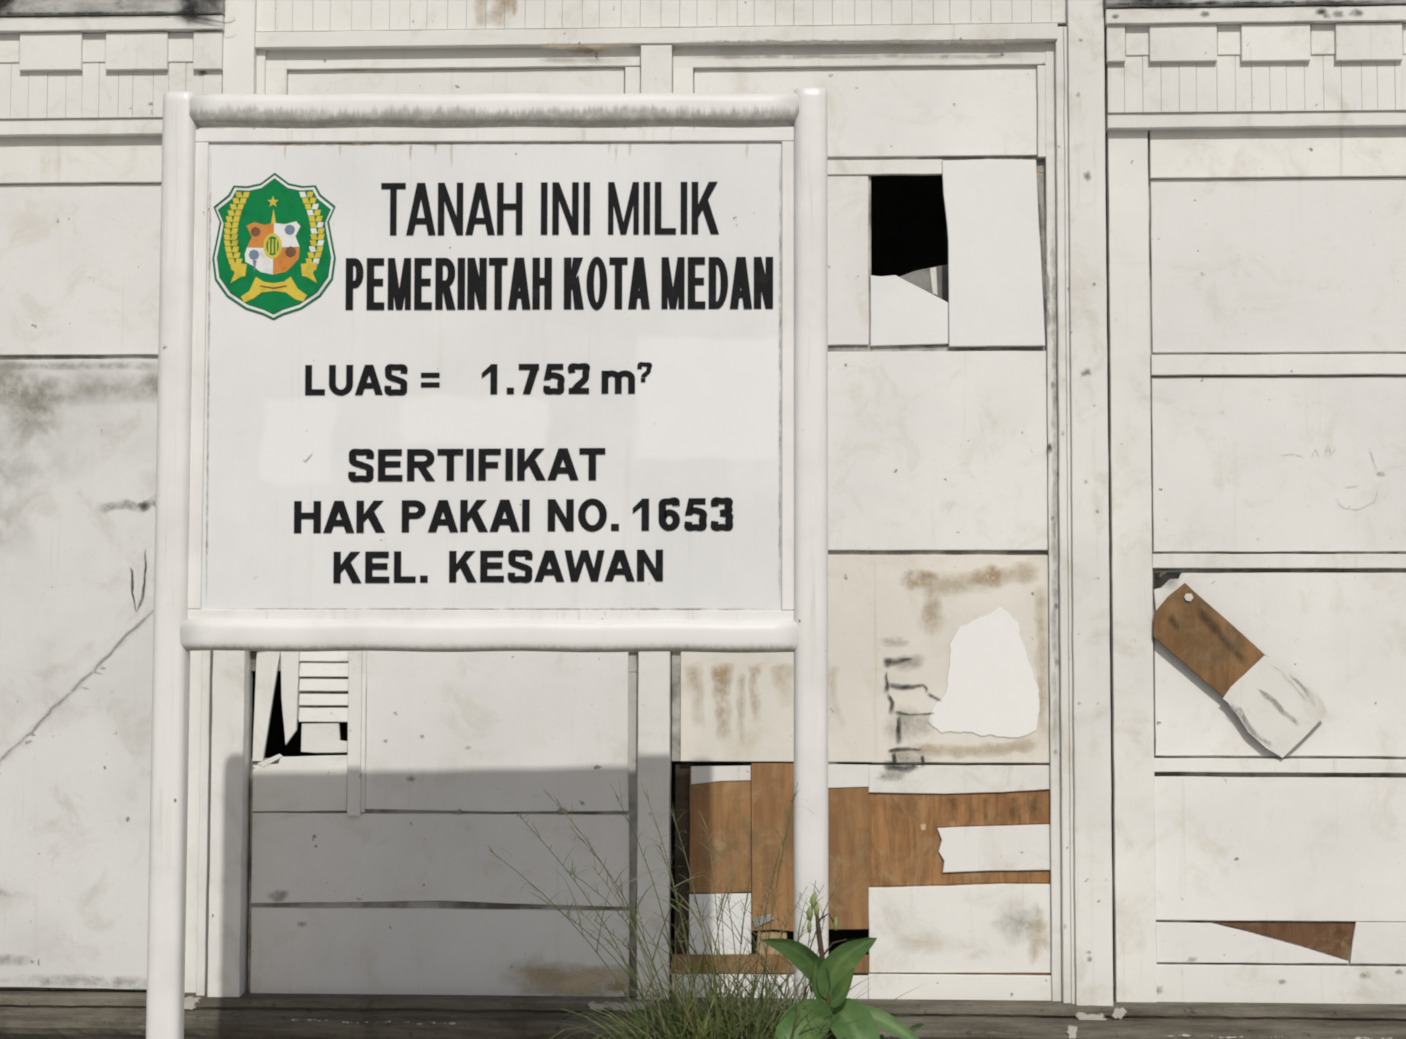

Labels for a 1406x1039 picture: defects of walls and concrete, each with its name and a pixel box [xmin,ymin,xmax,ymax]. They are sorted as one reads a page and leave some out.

peeling [1037,172,1055,323]
crack [0,559,147,760]
peeling [871,791,1050,886]
peeling [1215,921,1355,960]